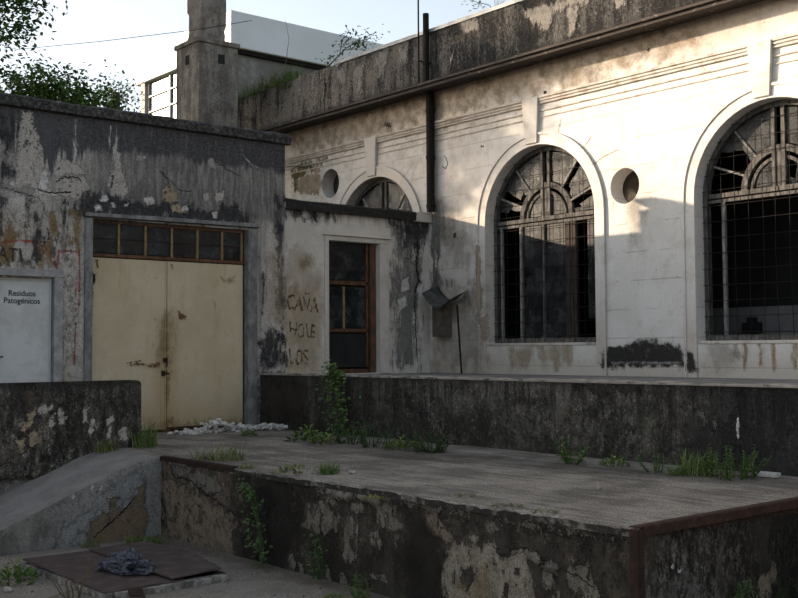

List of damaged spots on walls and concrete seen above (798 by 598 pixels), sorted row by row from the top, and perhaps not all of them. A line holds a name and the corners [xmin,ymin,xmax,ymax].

water stain [461,17,479,33]
water stain [25,201,49,261]
water stain [61,190,255,230]
spalling [144,182,189,214]
water stain [257,102,416,430]
water stain [386,205,448,373]
water stain [598,338,698,373]
spalling [14,403,68,454]
peeling [105,415,129,442]
spalling [161,464,244,557]
crack [170,466,242,518]
spalling [424,512,604,598]